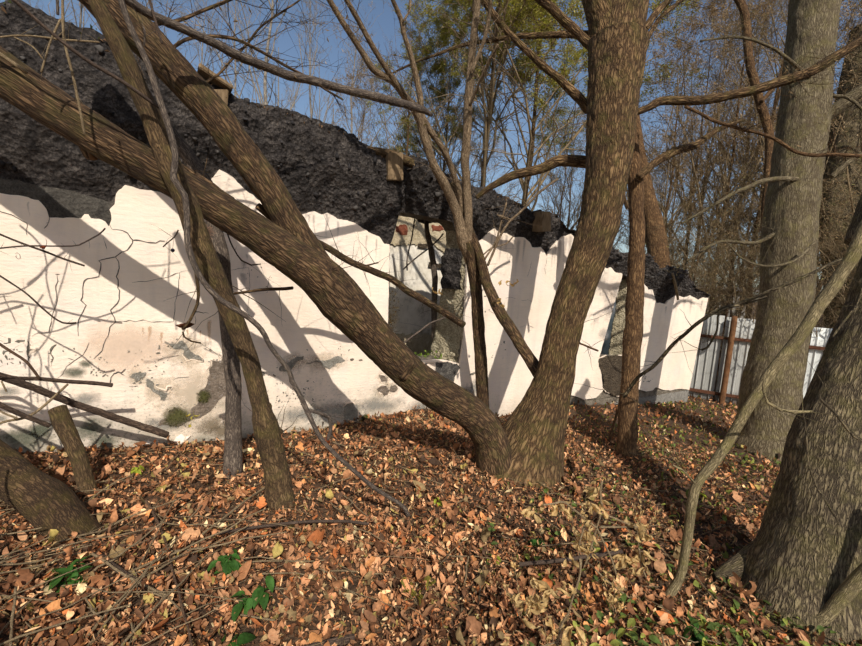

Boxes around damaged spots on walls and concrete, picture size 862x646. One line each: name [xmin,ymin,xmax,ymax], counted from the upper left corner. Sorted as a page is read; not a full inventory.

flaking render [0,178,116,226]
flaking render [396,224,408,235]
crack [58,226,182,378]
water stain [66,362,90,376]
water stain [0,425,50,446]
water stain [77,419,111,447]